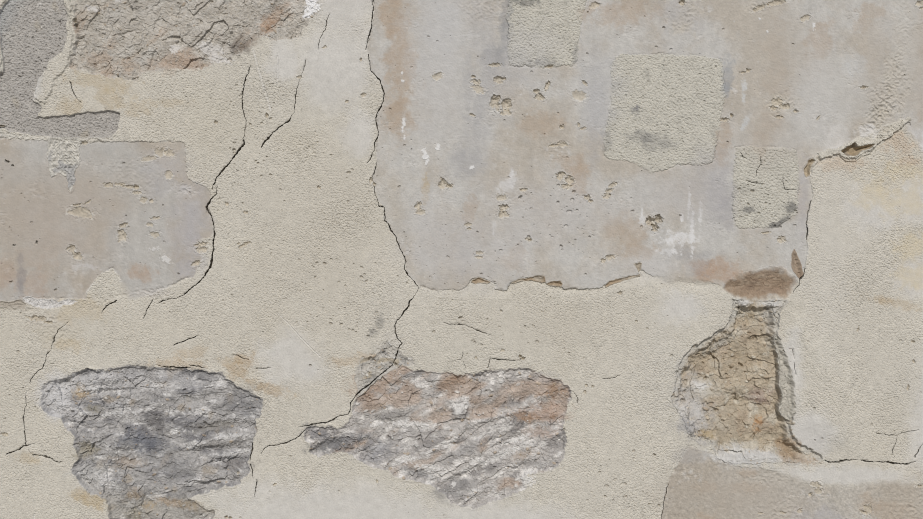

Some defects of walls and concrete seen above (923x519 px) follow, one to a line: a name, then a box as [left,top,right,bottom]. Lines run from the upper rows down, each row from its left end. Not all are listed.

spalling [0,0,322,191]
crack [144,14,330,317]
crack [250,0,418,495]
spalling [40,365,263,519]
spalling [304,341,572,510]
spalling [671,249,823,466]